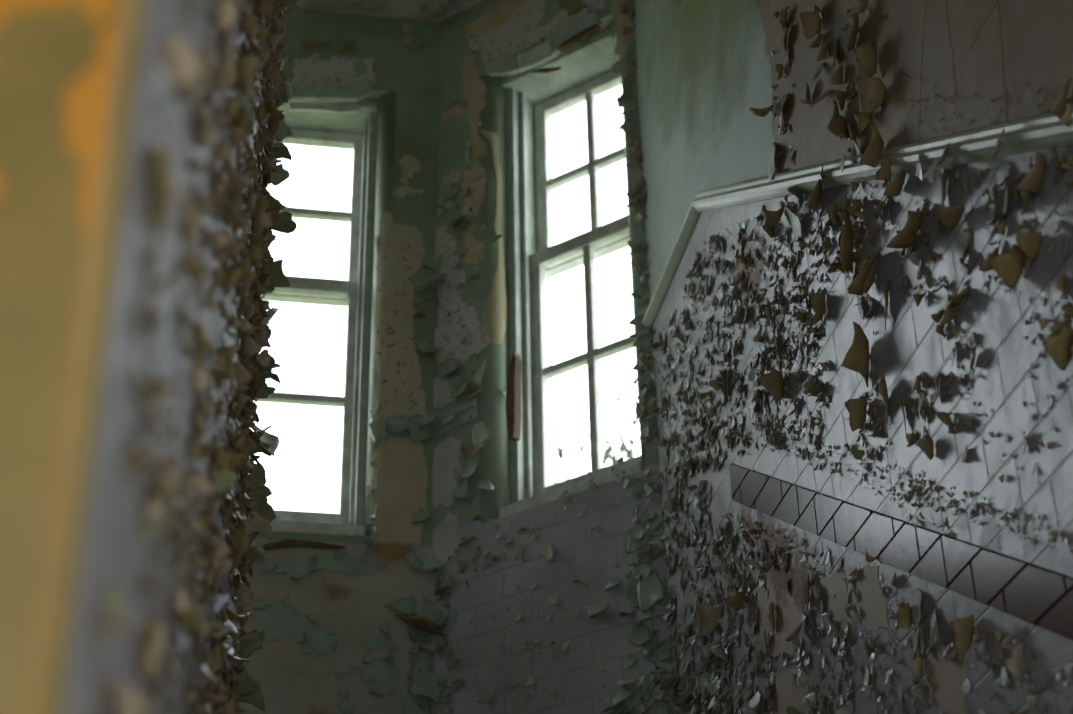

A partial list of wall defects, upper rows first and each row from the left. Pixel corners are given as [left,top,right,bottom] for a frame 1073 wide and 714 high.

peeling [91,0,381,714]
peeling [362,0,1073,714]